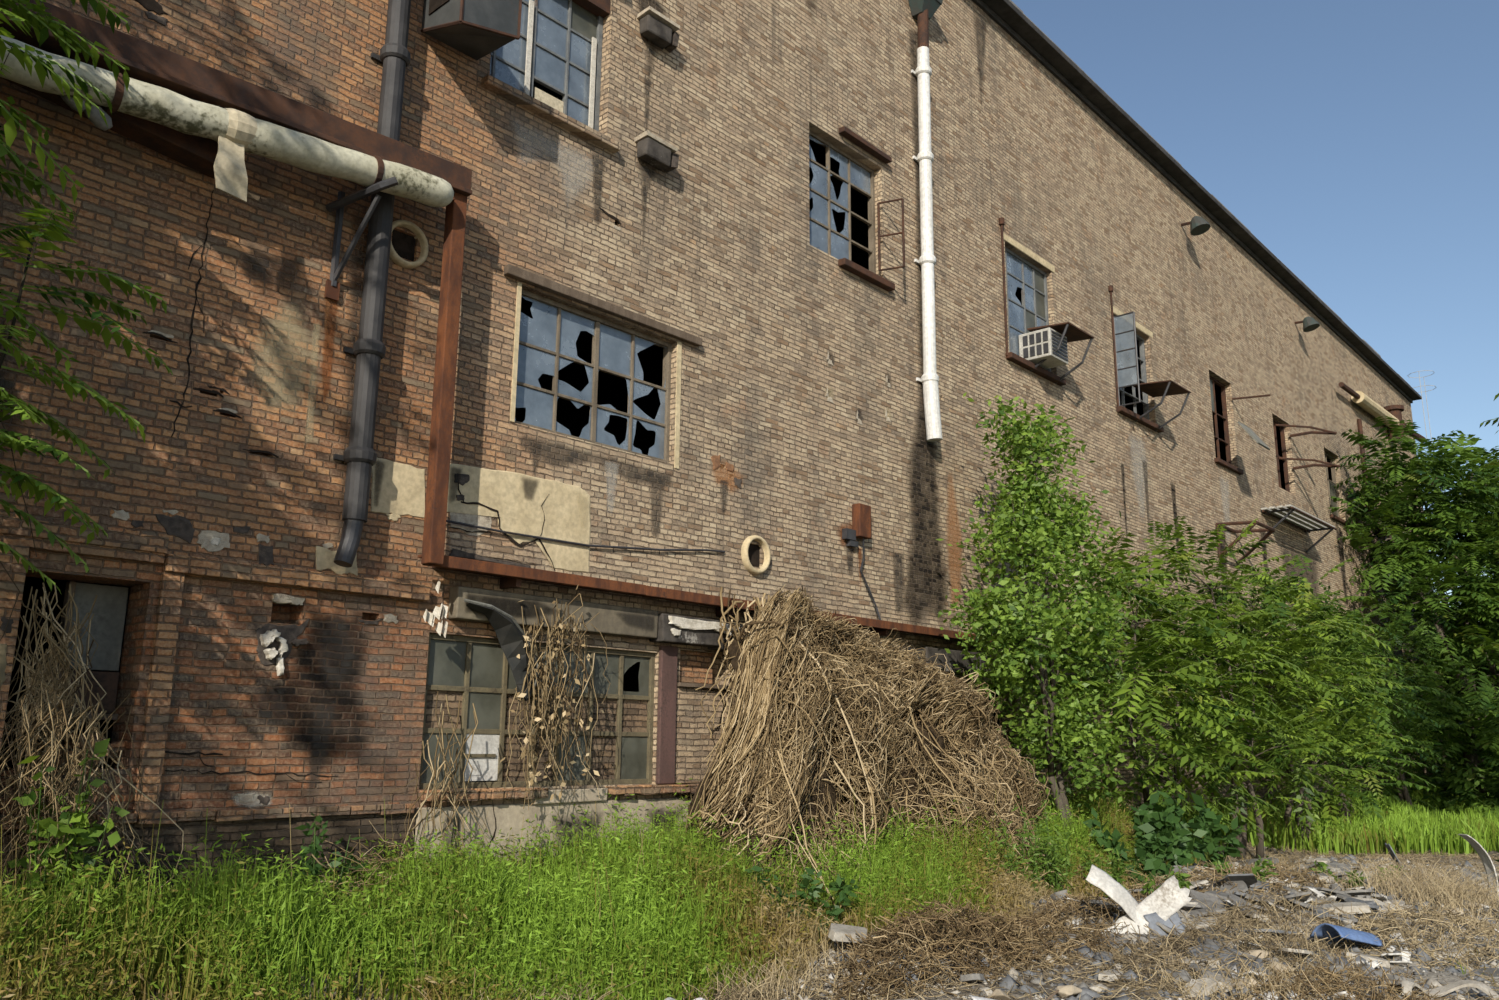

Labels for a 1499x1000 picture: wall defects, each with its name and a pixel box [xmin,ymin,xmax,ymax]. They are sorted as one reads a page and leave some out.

spalling [135,0,168,26]
crack [169,190,214,437]
water stain [893,31,945,625]
spalling [111,509,274,566]
flaking render [447,463,591,573]
water stain [257,616,366,787]